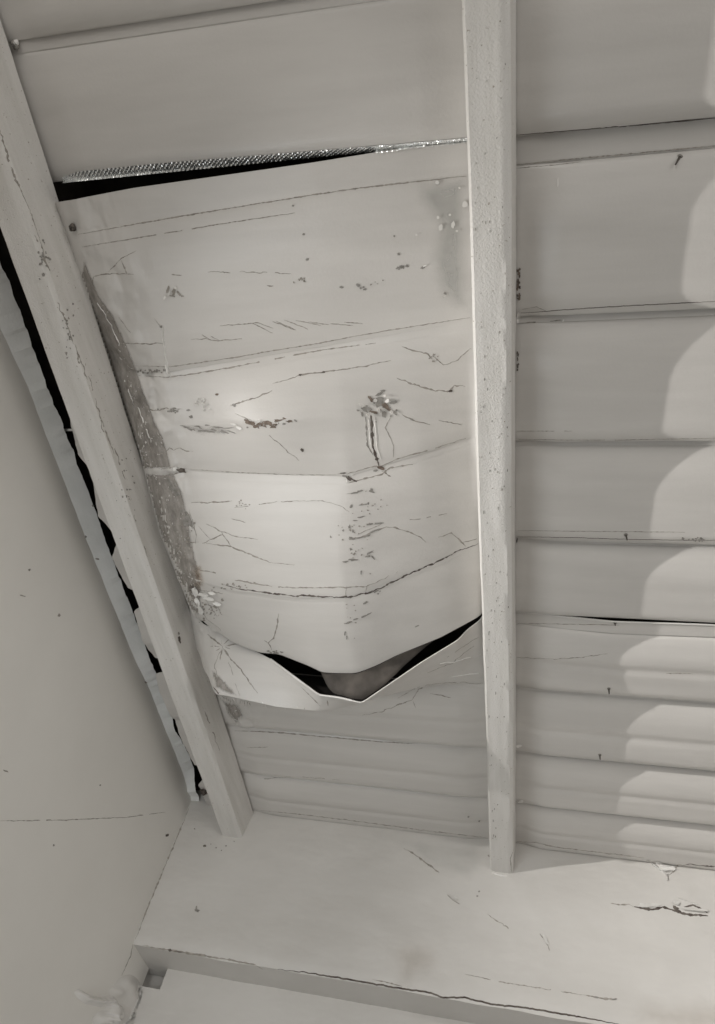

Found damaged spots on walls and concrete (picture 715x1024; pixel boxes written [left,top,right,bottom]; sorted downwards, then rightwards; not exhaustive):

crack [0,131,51,280]
crack [57,302,319,539]
crack [118,316,471,407]
peeling [357,390,398,422]
crack [191,415,477,654]
peeling [213,673,266,720]
crack [7,809,617,1024]